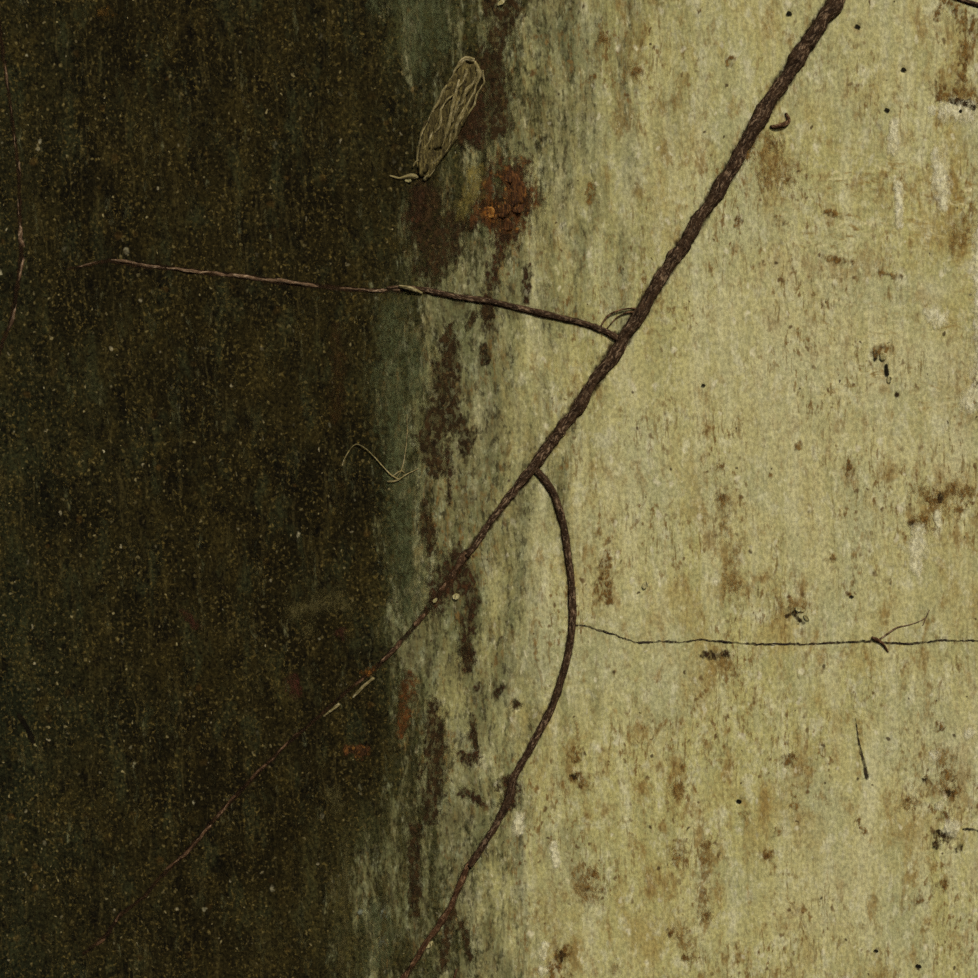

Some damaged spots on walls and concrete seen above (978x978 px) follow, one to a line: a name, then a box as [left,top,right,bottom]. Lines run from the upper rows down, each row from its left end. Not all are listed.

crack [955,0,978,8]
corrosion [461,151,545,321]
damp [0,0,547,978]
crack [67,0,846,978]
crack [740,610,978,653]
damp [550,841,561,868]